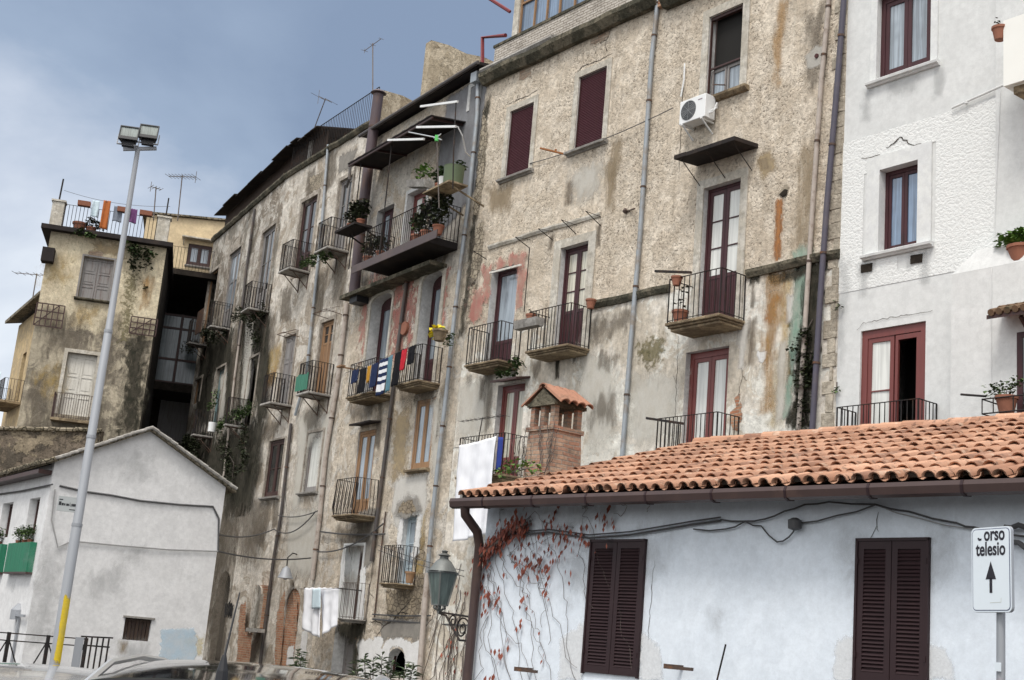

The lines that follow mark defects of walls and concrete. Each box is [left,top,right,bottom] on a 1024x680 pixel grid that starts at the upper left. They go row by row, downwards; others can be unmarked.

spalling [466,111,527,325]
corrosion [774,199,783,261]
leakage [47,315,87,351]
leakage [106,273,149,434]
corrosion [766,276,779,408]
spalling [730,394,742,431]
spalling [236,600,253,662]
spalling [274,590,308,667]